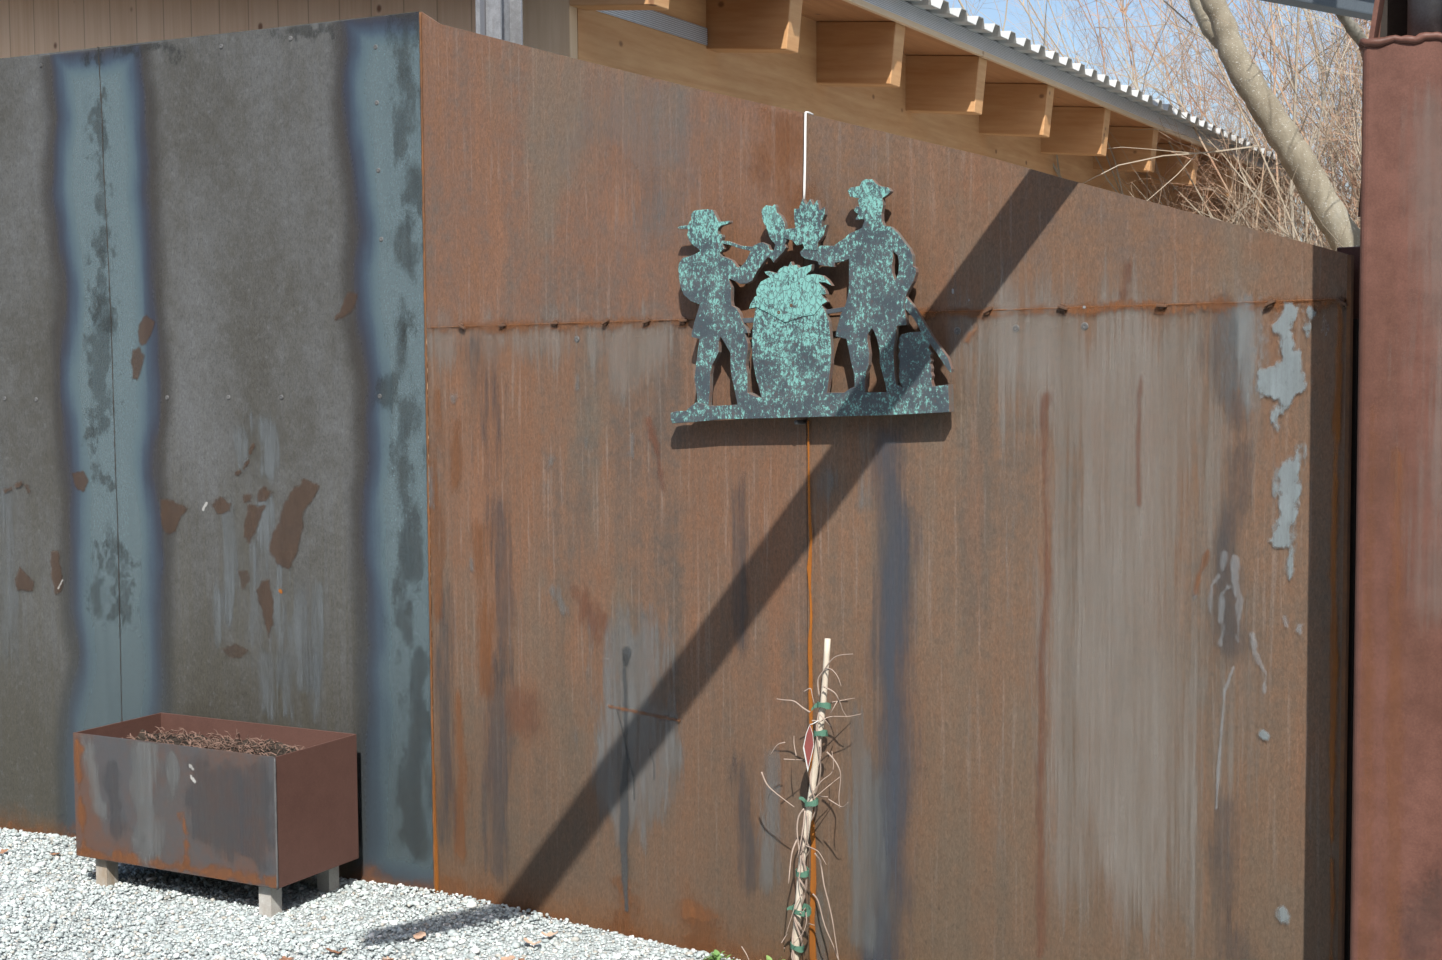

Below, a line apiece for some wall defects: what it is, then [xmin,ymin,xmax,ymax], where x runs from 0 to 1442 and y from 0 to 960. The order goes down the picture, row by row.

rust [1065,298,1228,315]
peeling [1257,303,1315,427]
rust [50,551,63,593]
rust [161,499,186,534]
rust [212,479,319,569]
rust [257,580,282,633]
peeling [1270,450,1302,580]
rust [1258,299,1346,841]
rust [418,729,459,898]
water stain [597,628,681,911]
rust [609,886,646,940]
rust [809,813,817,960]